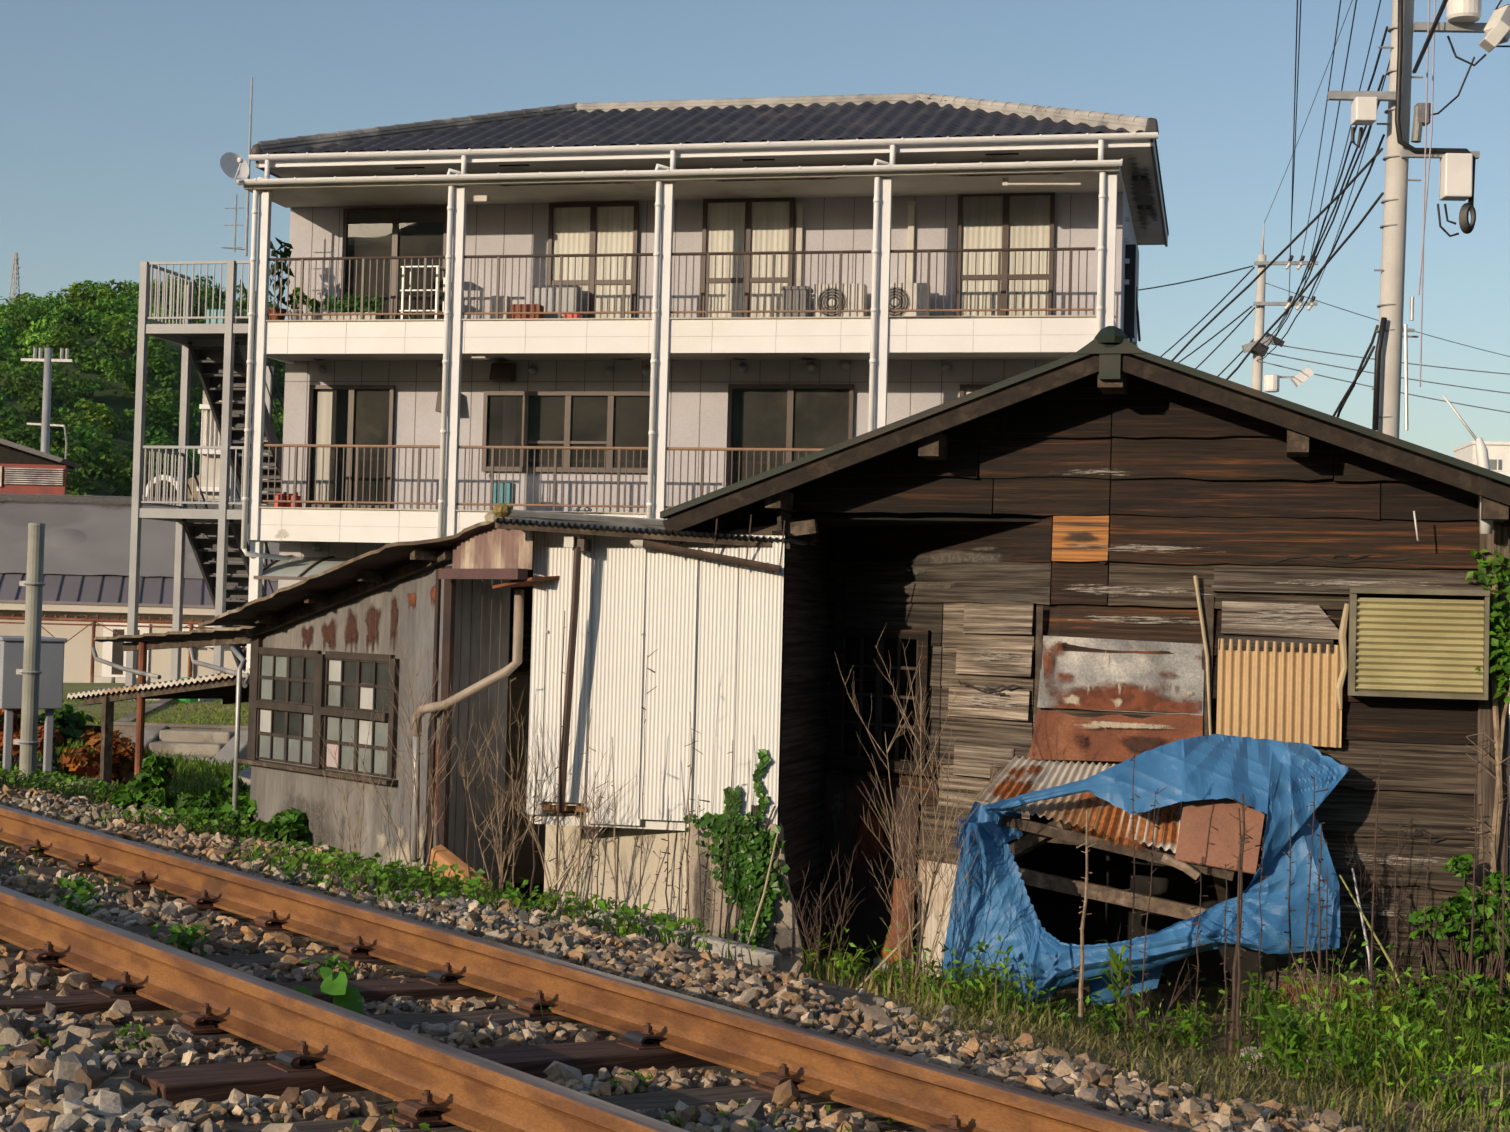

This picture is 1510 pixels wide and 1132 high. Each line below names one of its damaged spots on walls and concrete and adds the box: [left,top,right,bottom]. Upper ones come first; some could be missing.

damp [1131,163,1156,225]
corrosion [1043,641,1202,713]
corrosion [1121,736,1164,753]
corrosion [992,765,1043,800]
corrosion [1064,792,1181,848]